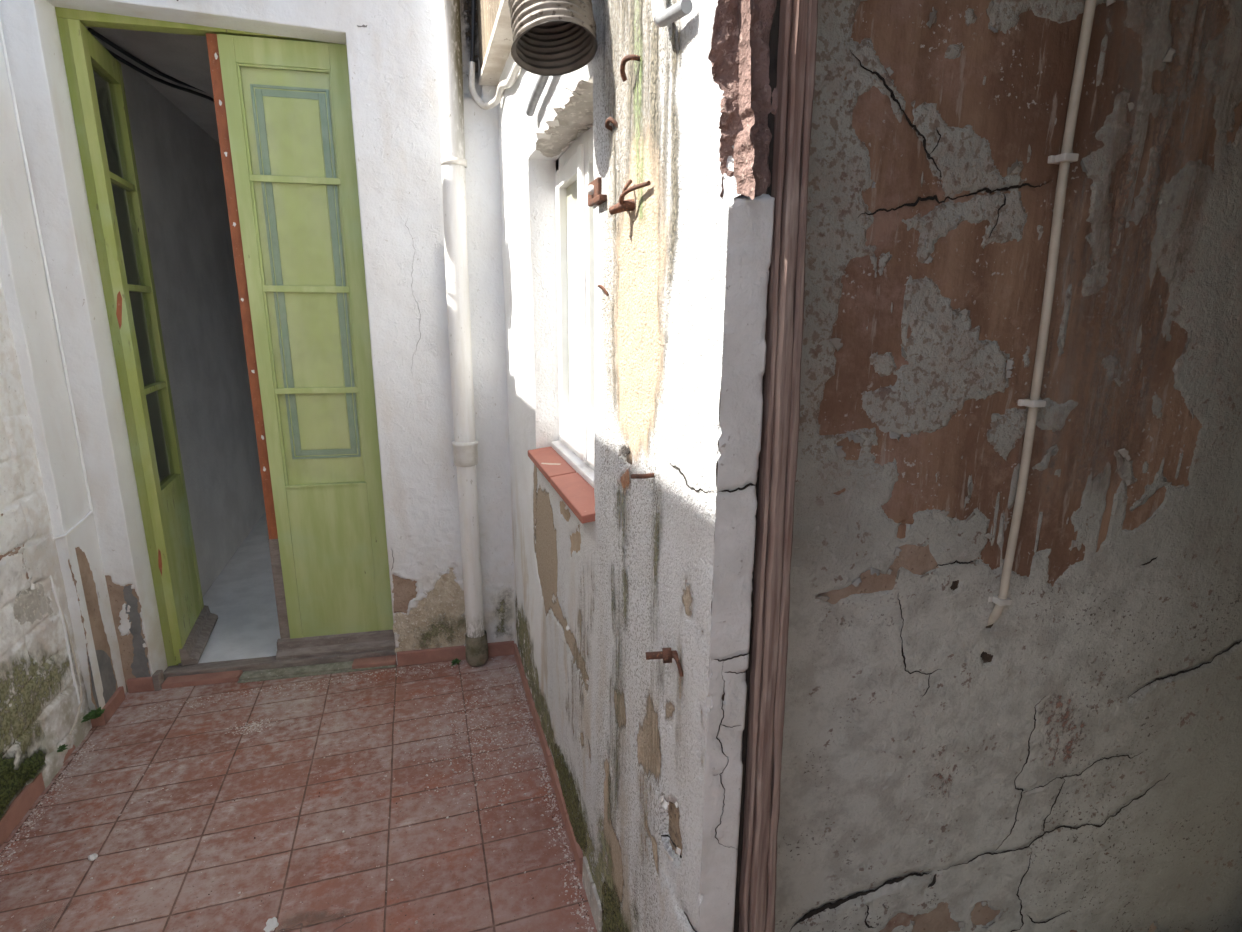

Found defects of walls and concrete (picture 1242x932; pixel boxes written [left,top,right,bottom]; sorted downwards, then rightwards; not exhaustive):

water stain [603,0,680,283]
spalling [708,0,778,200]
crack [850,50,1051,237]
water stain [611,262,619,416]
peeling [815,0,1242,604]
flaking render [68,547,151,709]
flaking render [533,464,589,690]
water stain [566,600,594,734]
water stain [607,490,628,820]
crack [668,462,755,493]
crack [1128,640,1242,699]
crack [790,699,1170,932]